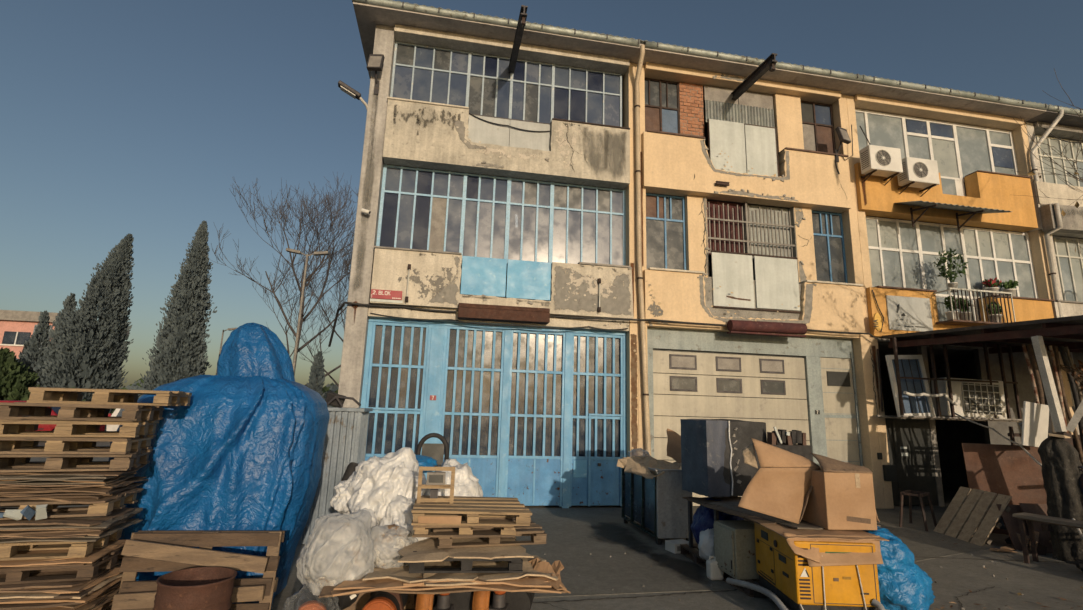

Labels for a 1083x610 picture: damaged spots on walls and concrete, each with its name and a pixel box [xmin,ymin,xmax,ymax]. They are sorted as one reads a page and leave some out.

peeling [398,257,488,305]
peeling [516,265,639,456]
damp [588,131,625,175]
flaking render [697,139,816,324]